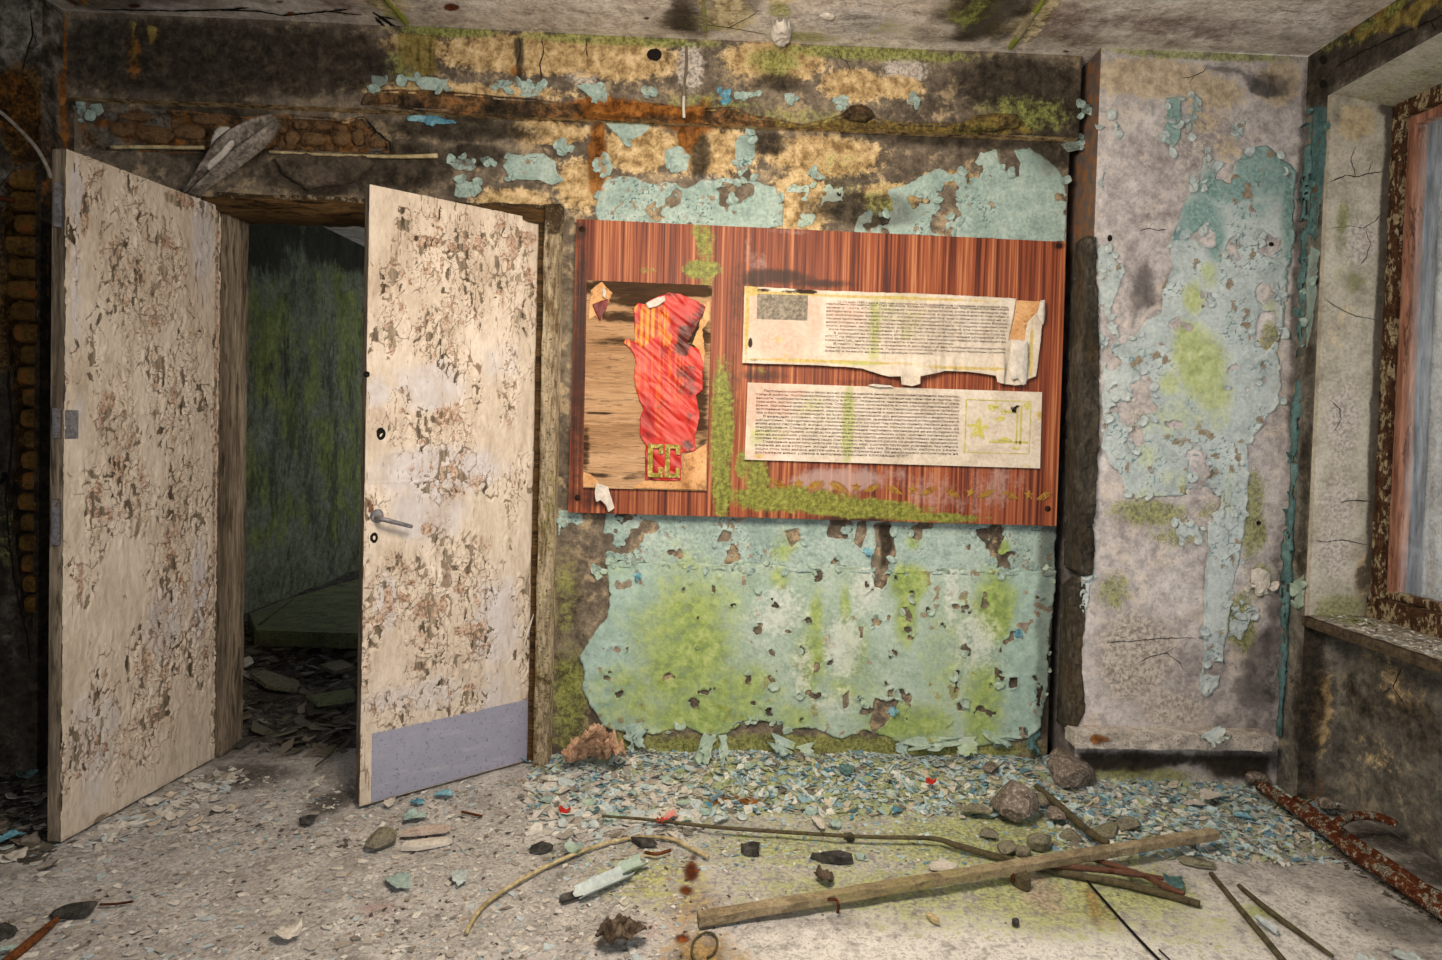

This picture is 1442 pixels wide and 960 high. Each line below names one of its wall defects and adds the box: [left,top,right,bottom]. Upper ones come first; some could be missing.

damp [666,0,695,31]
damp [953,0,1030,41]
spalling [647,48,662,61]
flaking render [0,70,50,633]
peeling [75,72,1331,829]